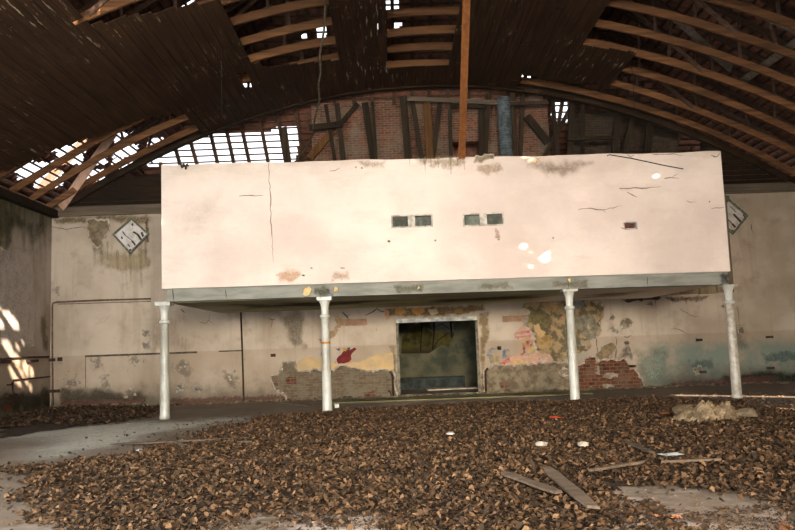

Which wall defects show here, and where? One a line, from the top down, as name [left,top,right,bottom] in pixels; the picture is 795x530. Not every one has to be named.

spalling [86,217,111,249]
crack [241,164,273,255]
spalling [473,154,494,163]
crack [579,153,682,213]
spalling [483,300,645,393]
flaking render [170,353,398,404]